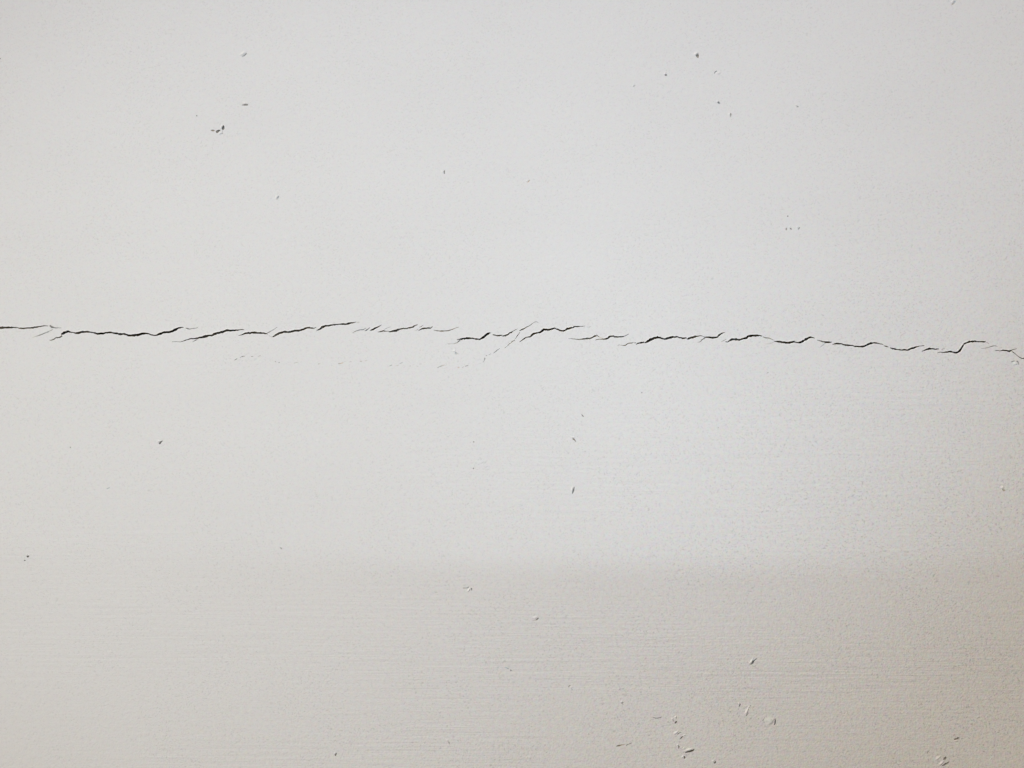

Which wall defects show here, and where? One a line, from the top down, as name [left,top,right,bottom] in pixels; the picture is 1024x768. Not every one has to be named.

crack [0,321,1024,368]